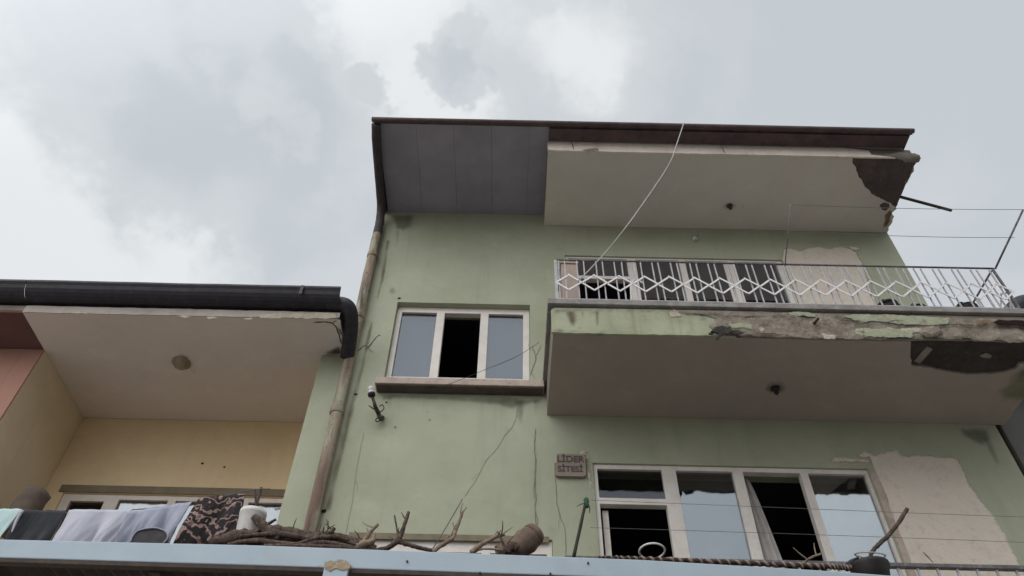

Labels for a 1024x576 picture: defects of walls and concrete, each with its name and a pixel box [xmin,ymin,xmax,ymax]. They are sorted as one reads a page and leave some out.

spalling [852,151,921,211]
flaking render [669,246,1024,373]
crack [466,406,566,553]
flaking render [830,450,1024,576]